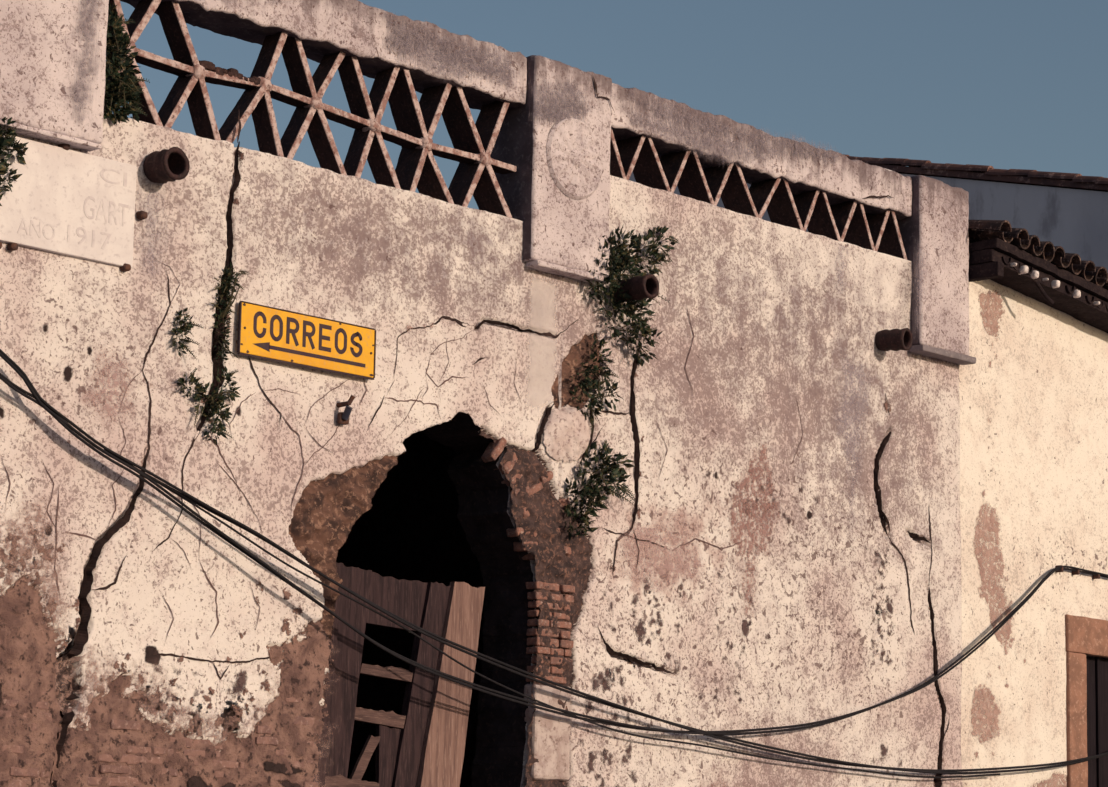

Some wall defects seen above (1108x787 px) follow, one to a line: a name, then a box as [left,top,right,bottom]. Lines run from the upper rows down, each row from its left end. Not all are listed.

crack [50,692,80,787]
crack [44,261,180,658]
flaking render [0,455,398,787]
crack [152,112,581,679]
spalling [479,426,593,787]
flaking render [551,333,604,409]
crack [597,625,678,675]
crack [581,348,746,573]
crack [685,306,694,394]
crack [873,393,950,787]